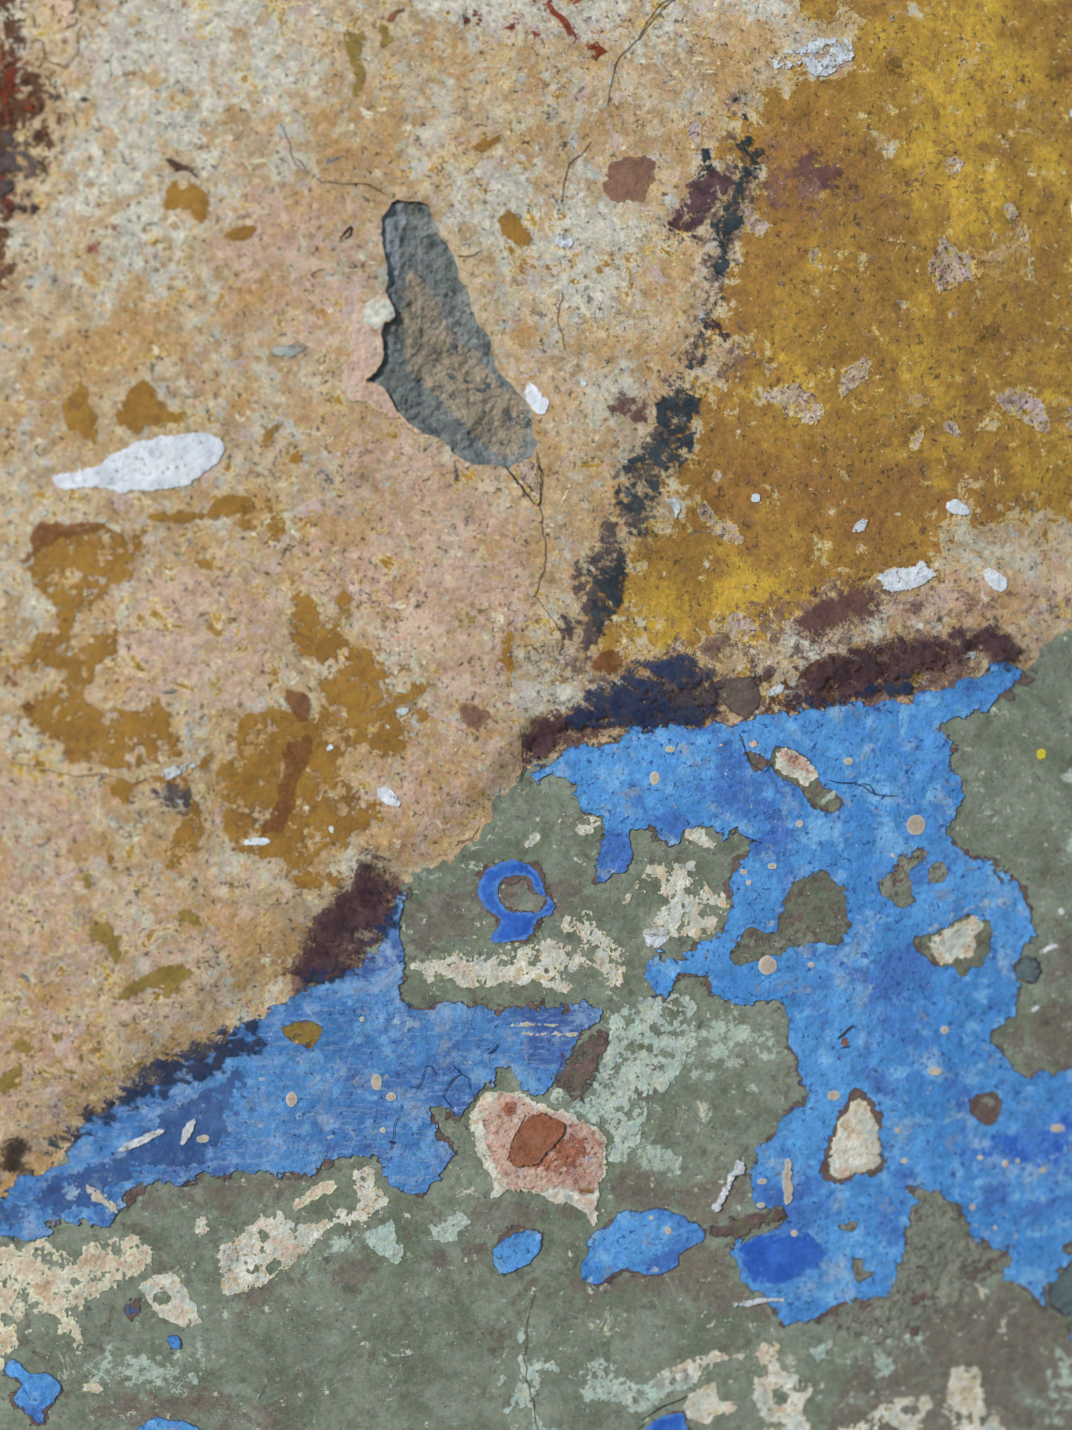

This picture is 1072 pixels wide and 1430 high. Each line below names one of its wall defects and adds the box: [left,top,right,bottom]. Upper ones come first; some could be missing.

peeling [0,0,108,141]
peeling [585,39,607,60]
spalling [341,200,541,504]
peeling [0,661,1072,1430]